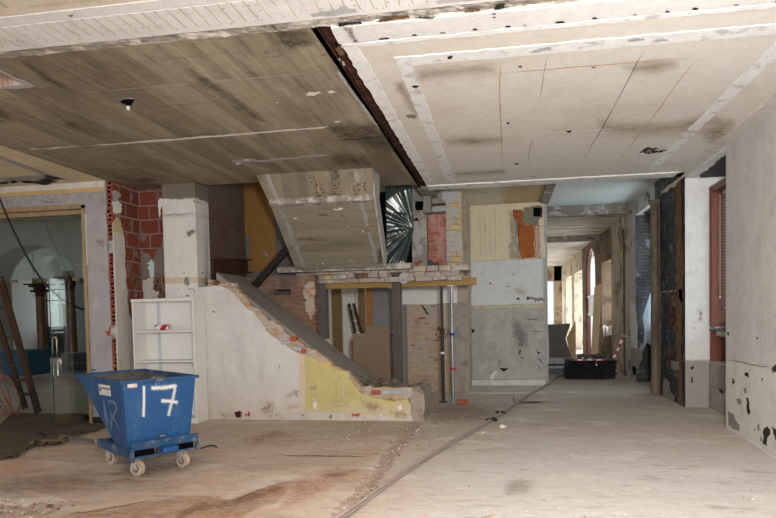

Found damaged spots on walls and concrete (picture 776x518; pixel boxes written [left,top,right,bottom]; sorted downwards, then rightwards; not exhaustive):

flaking render [129,260,165,299]
flaking render [728,411,740,431]
peeling [754,424,776,446]